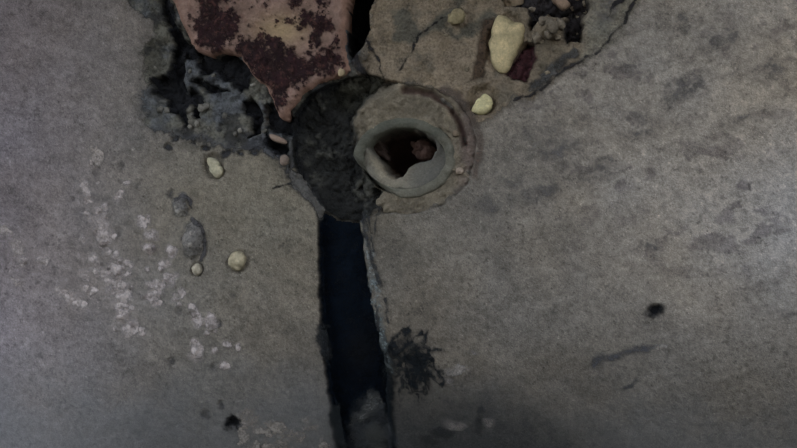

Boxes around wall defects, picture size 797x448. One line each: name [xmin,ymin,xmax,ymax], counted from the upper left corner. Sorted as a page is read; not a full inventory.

corrosion [188,0,346,110]
spalling [128,0,639,179]
efflorescence [55,181,145,338]
efflorescence [137,215,157,255]
efflorescence [145,245,241,359]
damp [316,206,535,448]